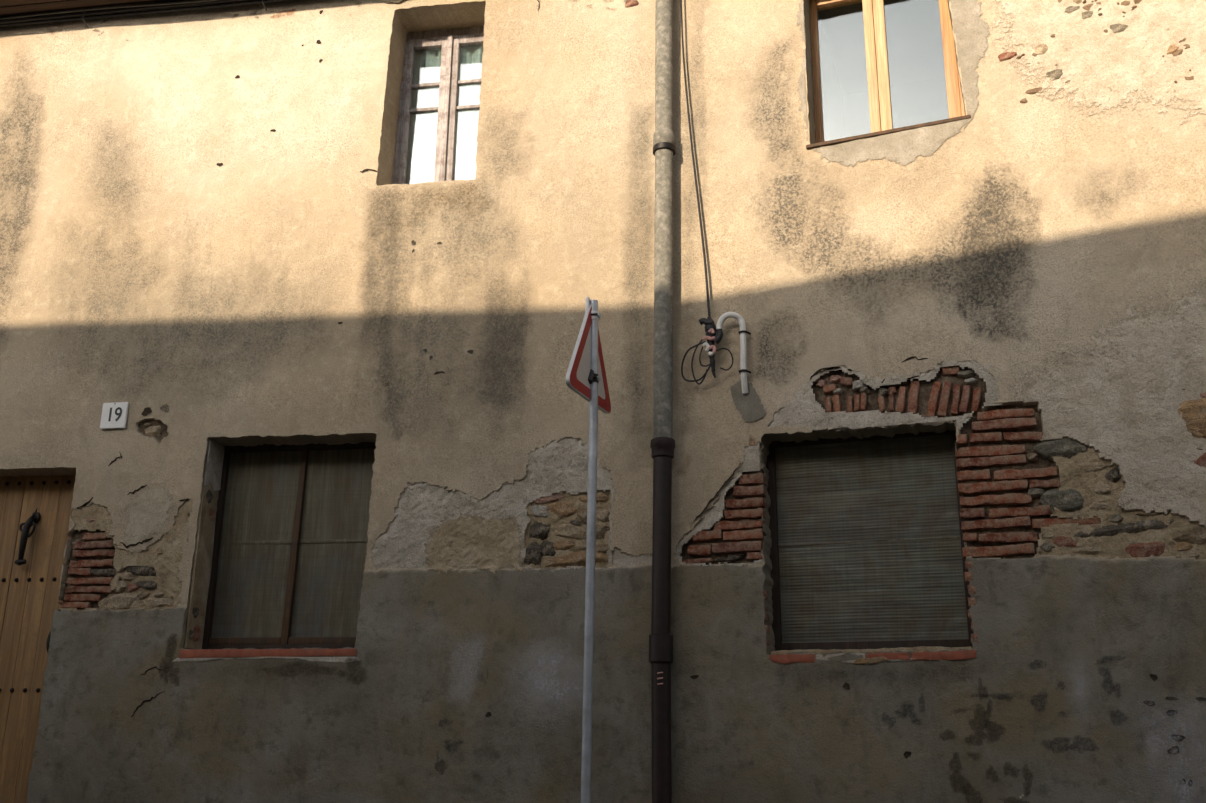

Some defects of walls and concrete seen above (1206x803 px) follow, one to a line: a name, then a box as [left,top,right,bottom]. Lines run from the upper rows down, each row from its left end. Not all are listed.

spalling [988,0,1206,133]
water stain [0,97,35,287]
water stain [768,172,1031,337]
spalling [138,420,168,442]
spalling [768,280,1206,560]
flaking render [58,486,193,611]
spalling [522,490,652,569]
spalling [675,443,767,566]
crack [131,666,165,717]